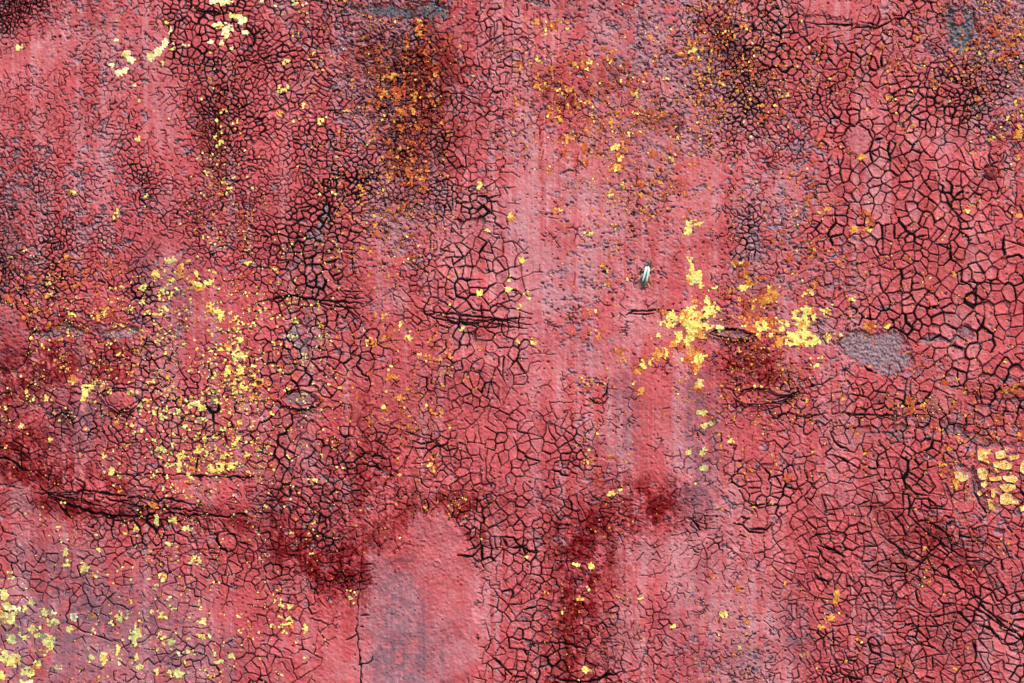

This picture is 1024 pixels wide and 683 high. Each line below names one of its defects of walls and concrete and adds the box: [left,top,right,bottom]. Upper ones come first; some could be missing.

corrosion [316,0,1024,352]
crack [0,0,732,683]
corrosion [549,368,642,479]
crack [607,0,1024,683]
spalling [614,98,1024,617]
peeling [583,479,634,538]
peeling [530,525,644,682]
peeling [669,604,771,682]
peeling [776,577,867,676]